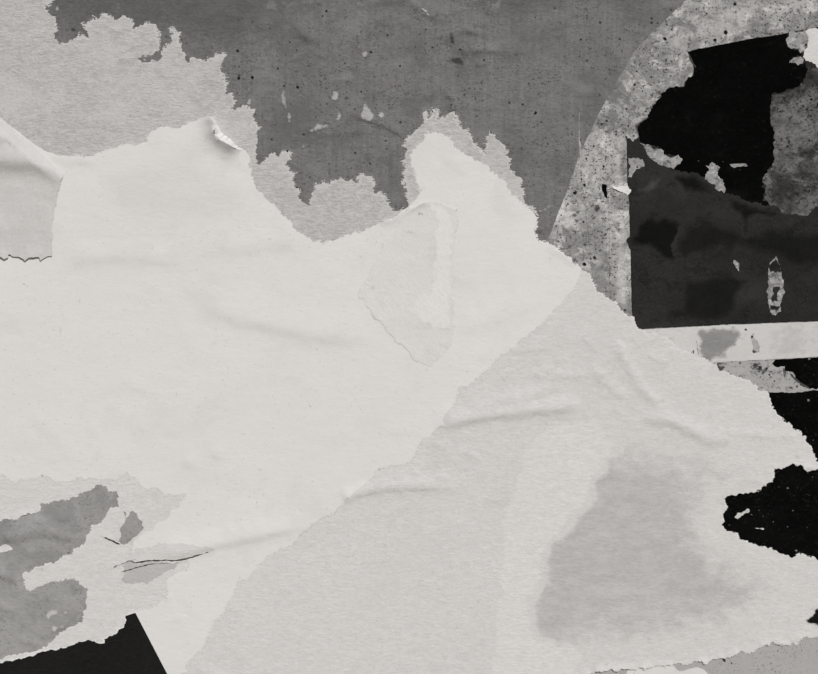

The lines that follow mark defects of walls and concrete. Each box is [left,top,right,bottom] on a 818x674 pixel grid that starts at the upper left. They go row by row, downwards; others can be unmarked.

peeling [762,28,818,216]
peeling [610,143,682,195]
peeling [705,162,726,193]
peeling [766,256,785,316]
peeling [695,324,760,363]
peeling [772,358,818,388]
peeling [26,511,213,589]
crack [105,537,214,572]